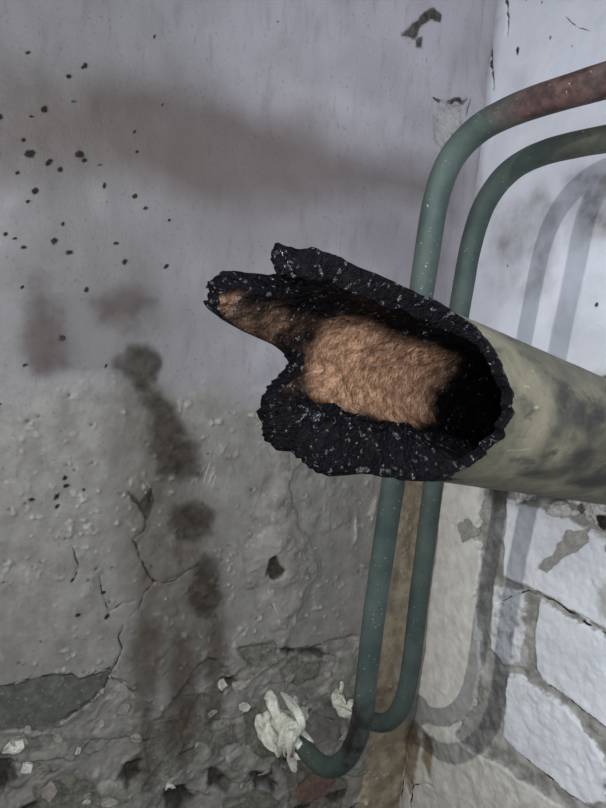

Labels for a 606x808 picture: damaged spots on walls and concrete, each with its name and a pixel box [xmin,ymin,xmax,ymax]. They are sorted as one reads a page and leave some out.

damp [105,347,199,476]
damp [172,504,213,541]
spalling [539,500,606,573]
crack [97,482,196,699]
damp [190,558,221,616]
spalling [217,677,252,693]
spalling [237,640,331,686]
peeling [0,667,118,808]
spalling [120,693,352,808]